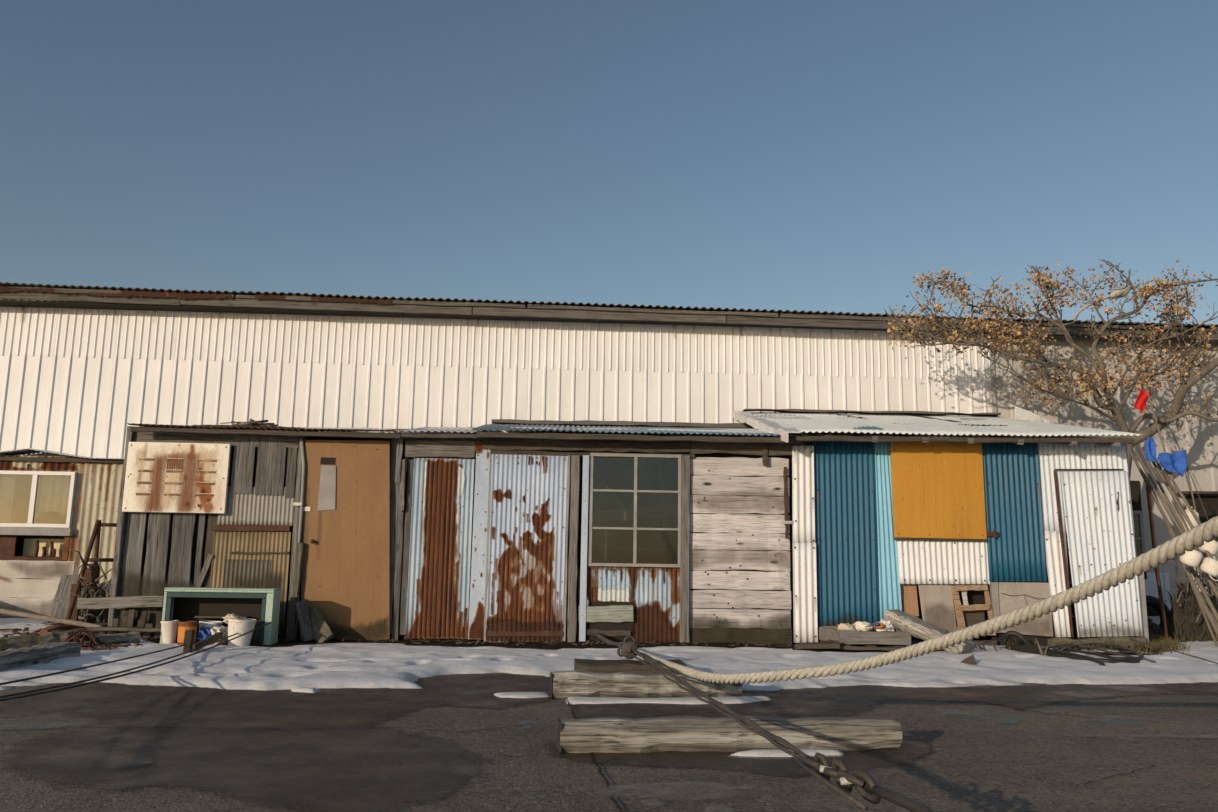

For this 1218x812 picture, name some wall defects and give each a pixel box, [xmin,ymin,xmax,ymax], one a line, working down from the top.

corrosion [0,455,110,516]
corrosion [139,445,215,513]
corrosion [404,456,563,642]
corrosion [578,567,680,643]
crack [591,752,636,812]